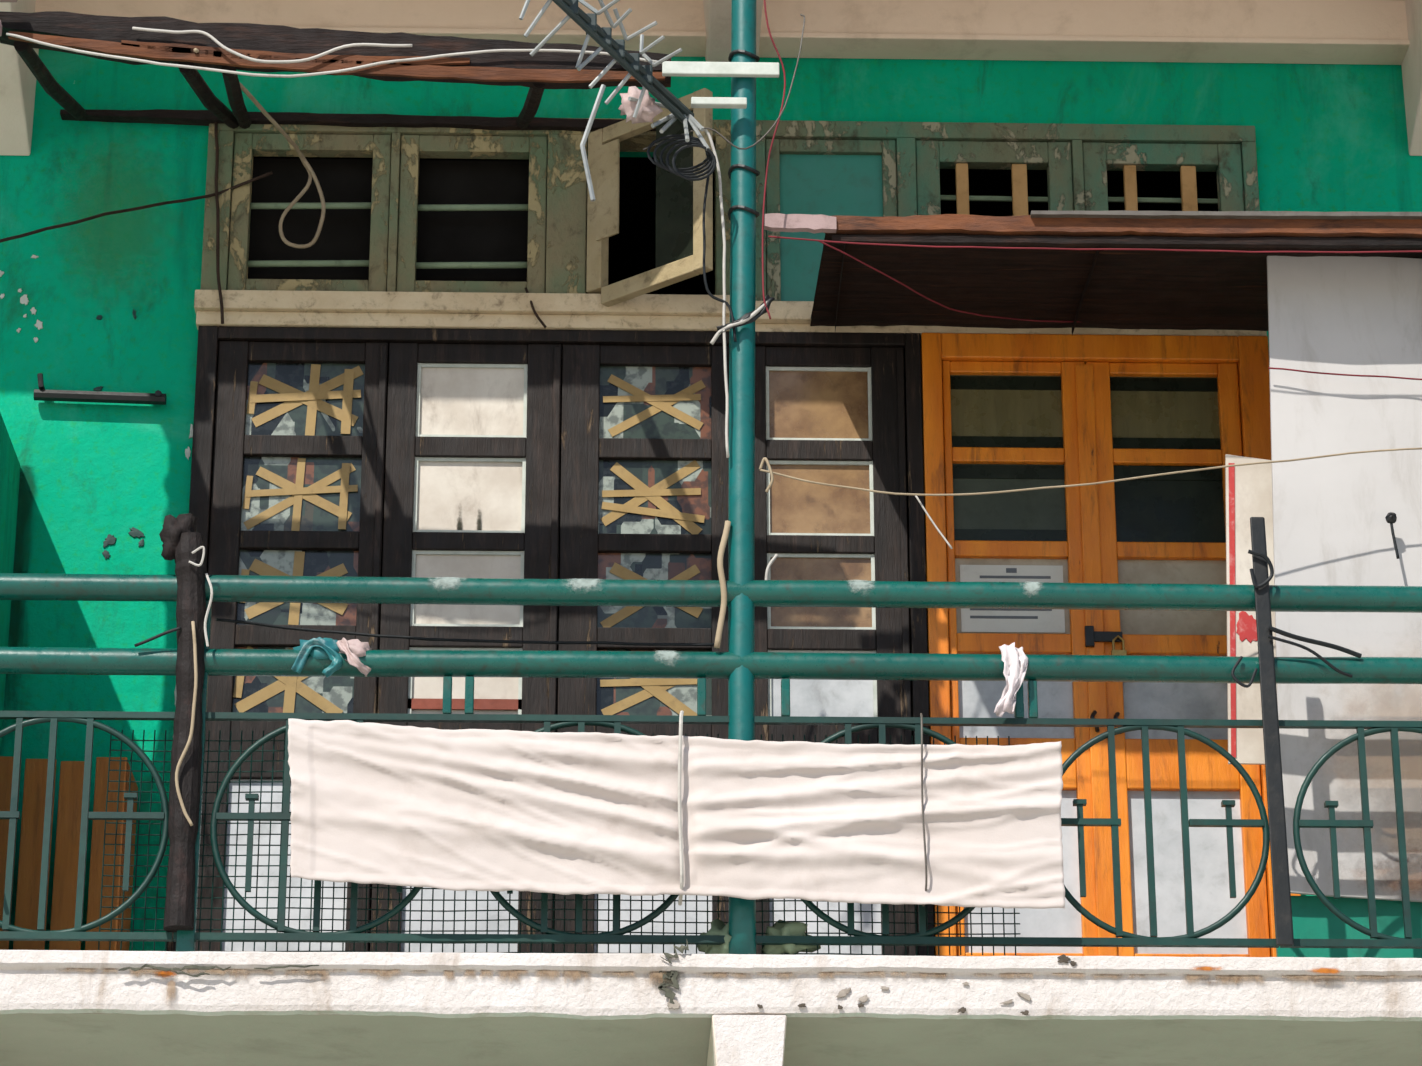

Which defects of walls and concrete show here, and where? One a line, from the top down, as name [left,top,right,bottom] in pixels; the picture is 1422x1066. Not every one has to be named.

peeling [0,270,43,343]
peeling [102,527,145,559]